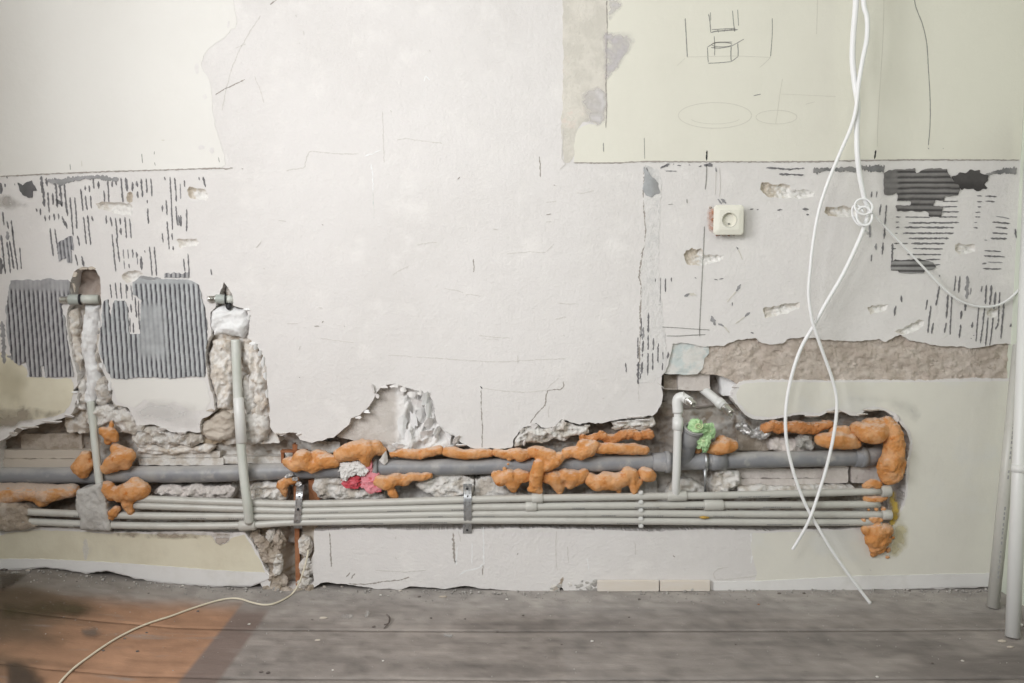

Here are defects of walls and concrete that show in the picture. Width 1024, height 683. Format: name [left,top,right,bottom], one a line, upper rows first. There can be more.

flaking render [0,266,475,467]
crack [388,335,565,445]
peeling [148,0,1024,581]
peeling [0,480,319,591]